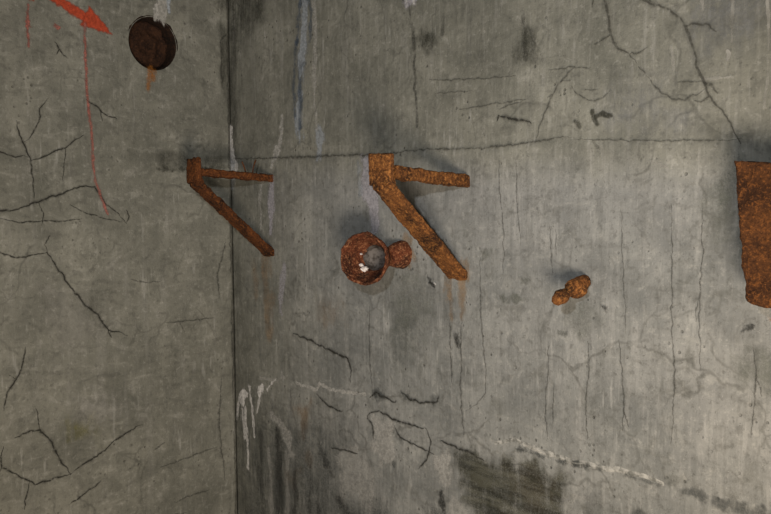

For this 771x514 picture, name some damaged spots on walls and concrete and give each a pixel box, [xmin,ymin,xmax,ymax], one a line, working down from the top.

crack [220,35,369,159]
crack [592,0,640,61]
crack [643,0,740,142]
crack [393,66,713,261]
crack [0,103,129,336]
crack [4,347,26,406]
crack [293,333,352,377]
crack [0,407,142,510]
damp [237,389,249,470]
crack [367,392,484,468]
damp [454,452,563,514]